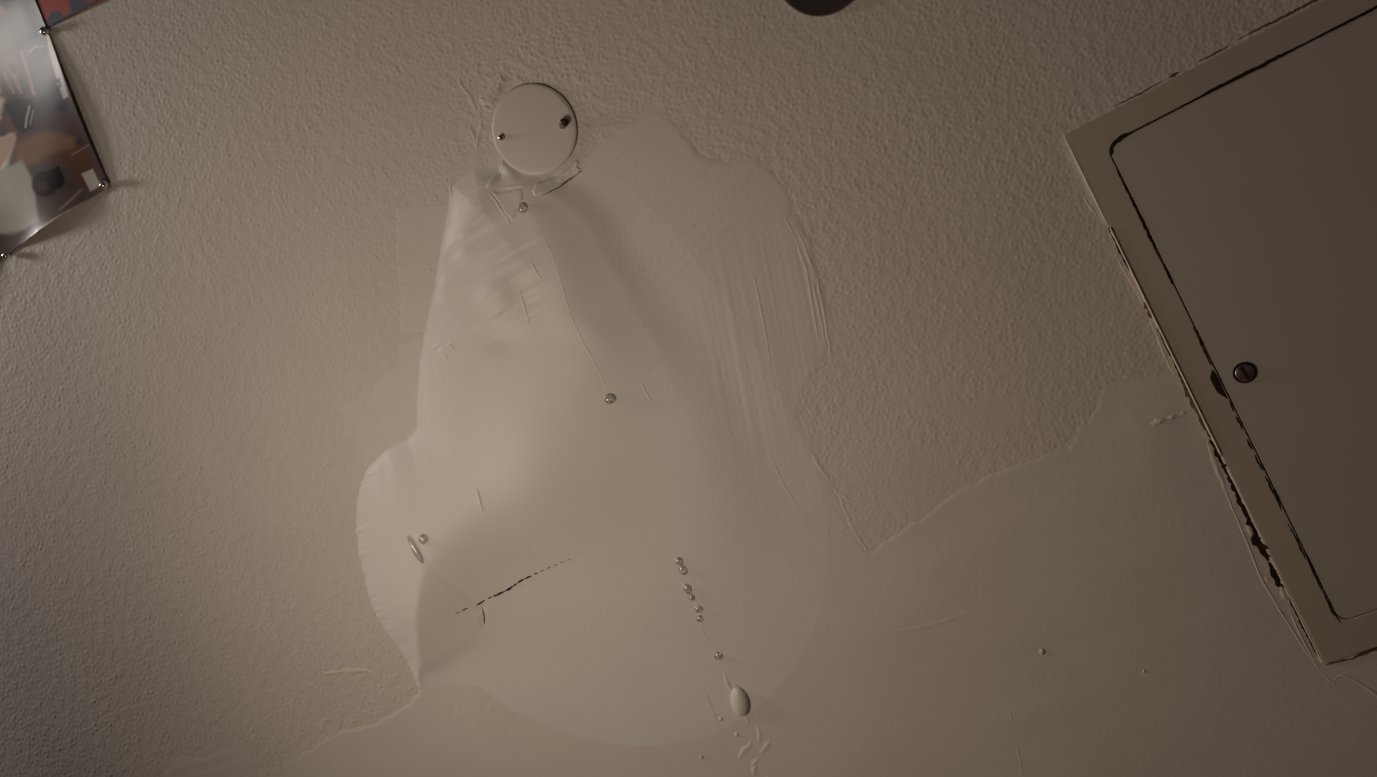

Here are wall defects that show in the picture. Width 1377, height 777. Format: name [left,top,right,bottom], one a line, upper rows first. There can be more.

crack [455,562,563,624]
crack [1064,0,1377,675]